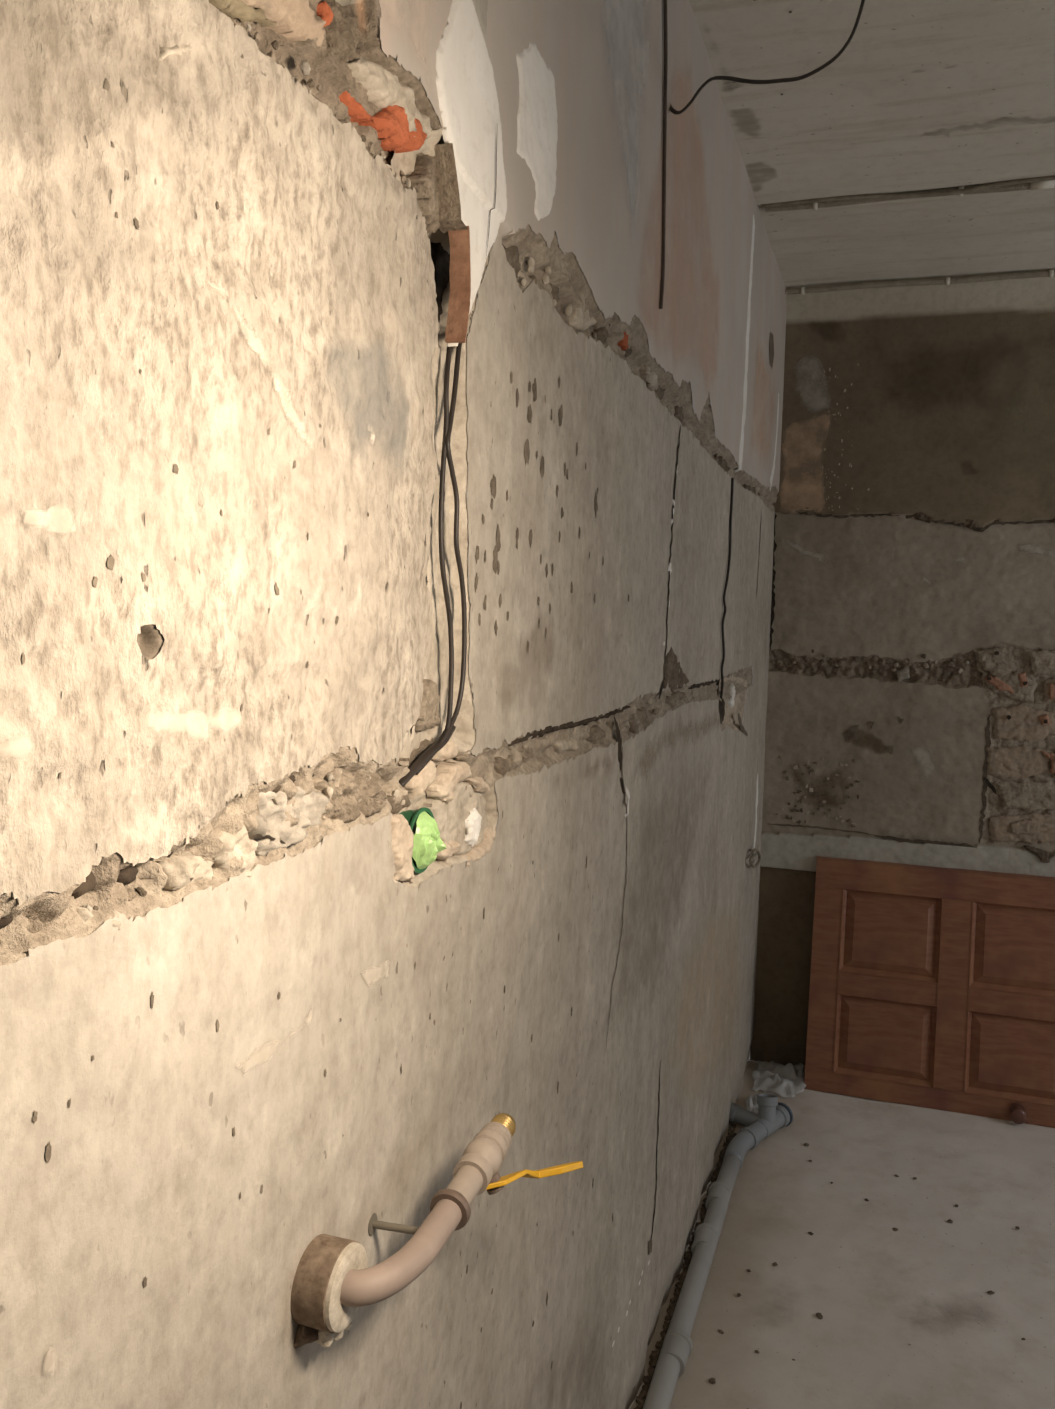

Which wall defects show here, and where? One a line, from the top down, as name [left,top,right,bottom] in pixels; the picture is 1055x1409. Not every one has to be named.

flaking render [208,0,443,190]
flaking render [502,224,1055,542]
spalling [93,555,115,588]
spalling [475,474,554,636]
crack [659,425,689,699]
spalling [0,917,13,929]
spalling [72,870,96,899]
spalling [116,866,139,884]
spalling [383,679,499,888]
crack [606,710,630,1046]
spalling [717,675,748,736]
flaking render [974,642,1055,846]